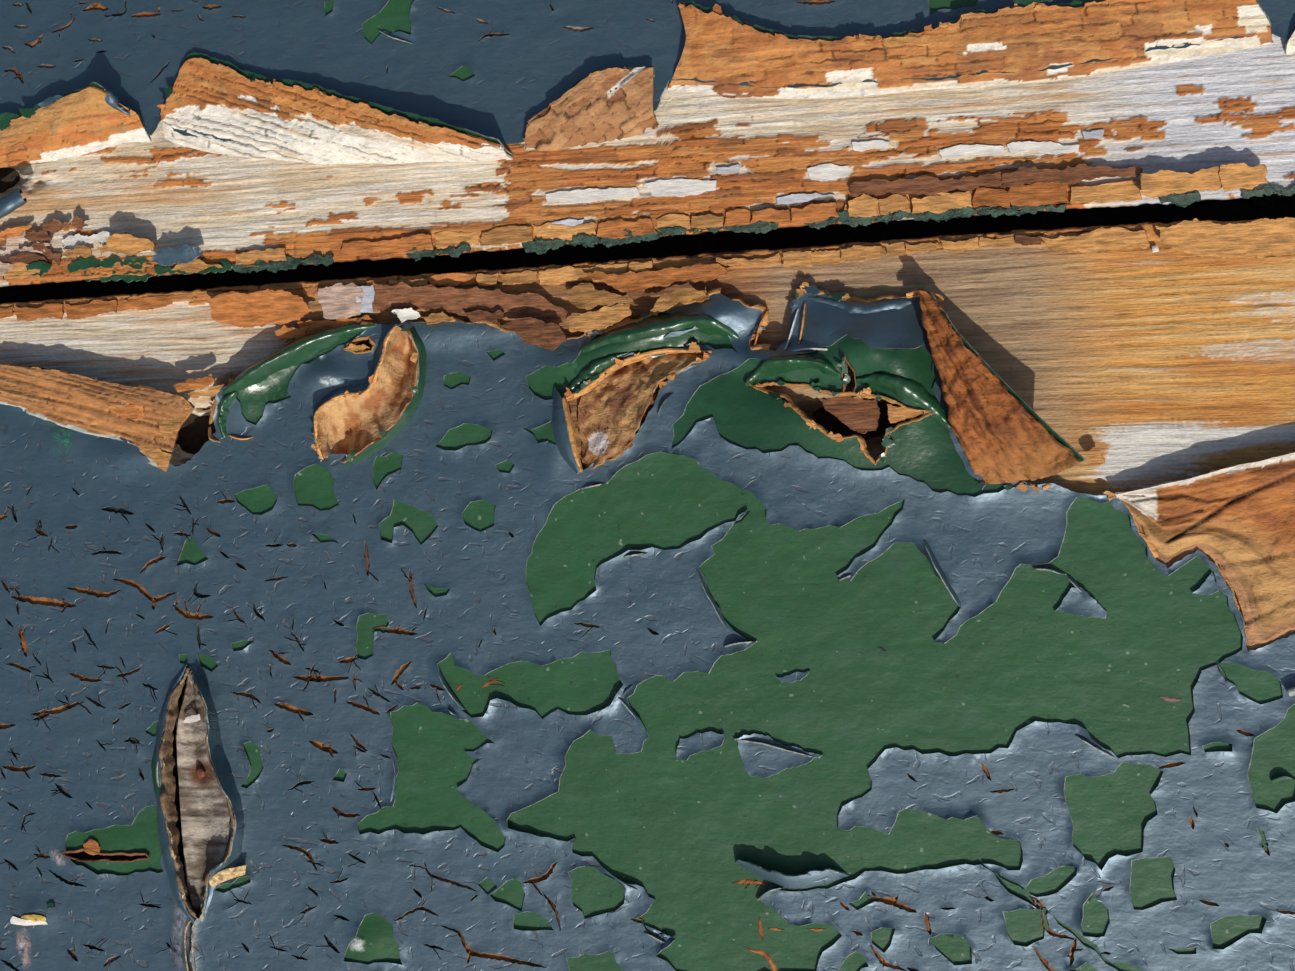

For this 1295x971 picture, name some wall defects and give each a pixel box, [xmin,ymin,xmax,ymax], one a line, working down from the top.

peeling [362,0,415,44]
peeling [0,95,63,131]
peeling [852,140,890,152]
peeling [939,130,1104,160]
peeling [546,164,740,203]
peeling [776,163,849,205]
peeling [548,219,584,228]
peeling [237,322,361,425]
peeling [294,464,339,511]
peeling [356,329,1295,971]
crack [0,486,505,971]
peeling [66,805,163,876]